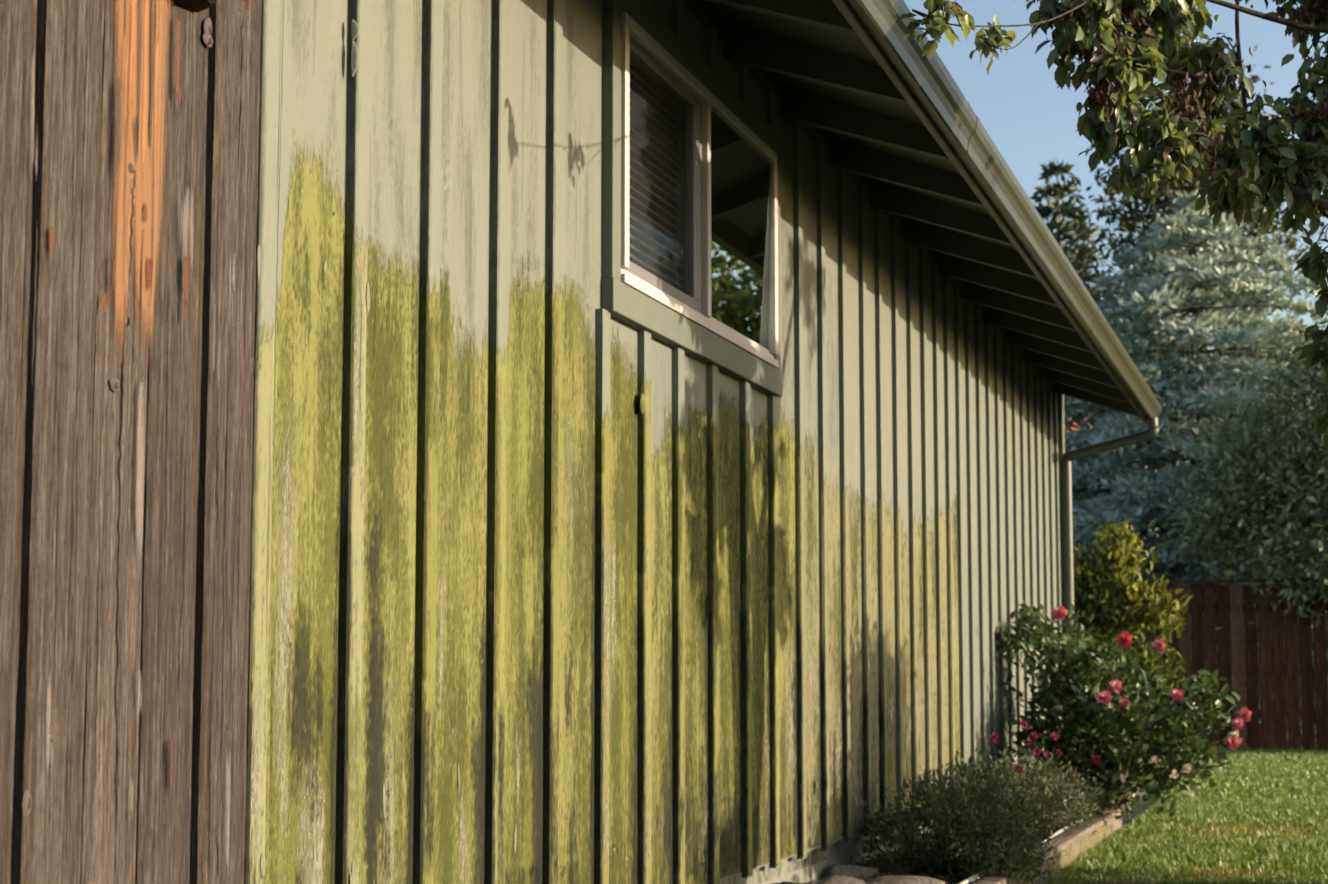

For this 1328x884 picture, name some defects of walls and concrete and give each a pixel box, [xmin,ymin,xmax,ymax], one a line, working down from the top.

water stain [244,711,256,884]
water stain [288,504,392,884]
water stain [408,673,436,884]
water stain [471,484,886,884]